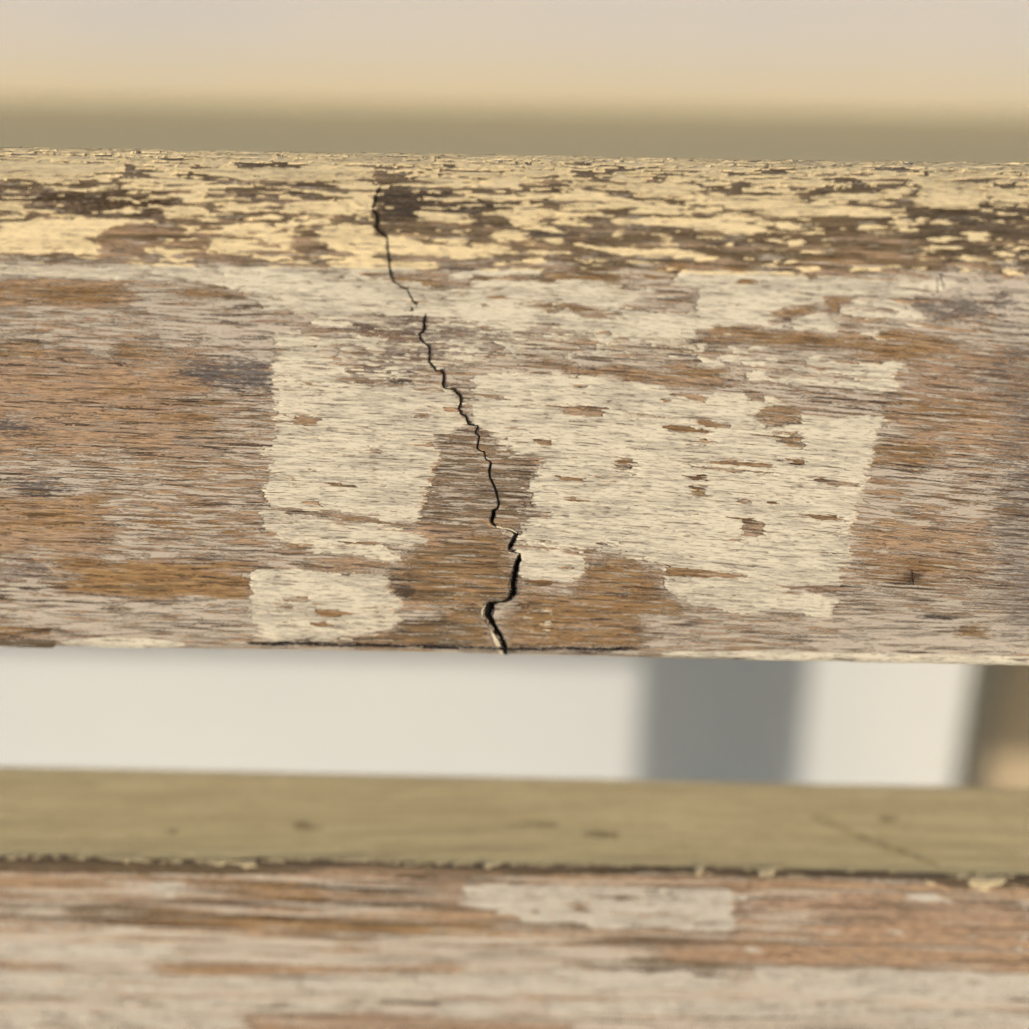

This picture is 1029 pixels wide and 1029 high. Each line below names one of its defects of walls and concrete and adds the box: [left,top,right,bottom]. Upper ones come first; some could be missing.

crack [372,182,521,655]
peeling [0,147,1029,649]
peeling [0,854,1029,1029]